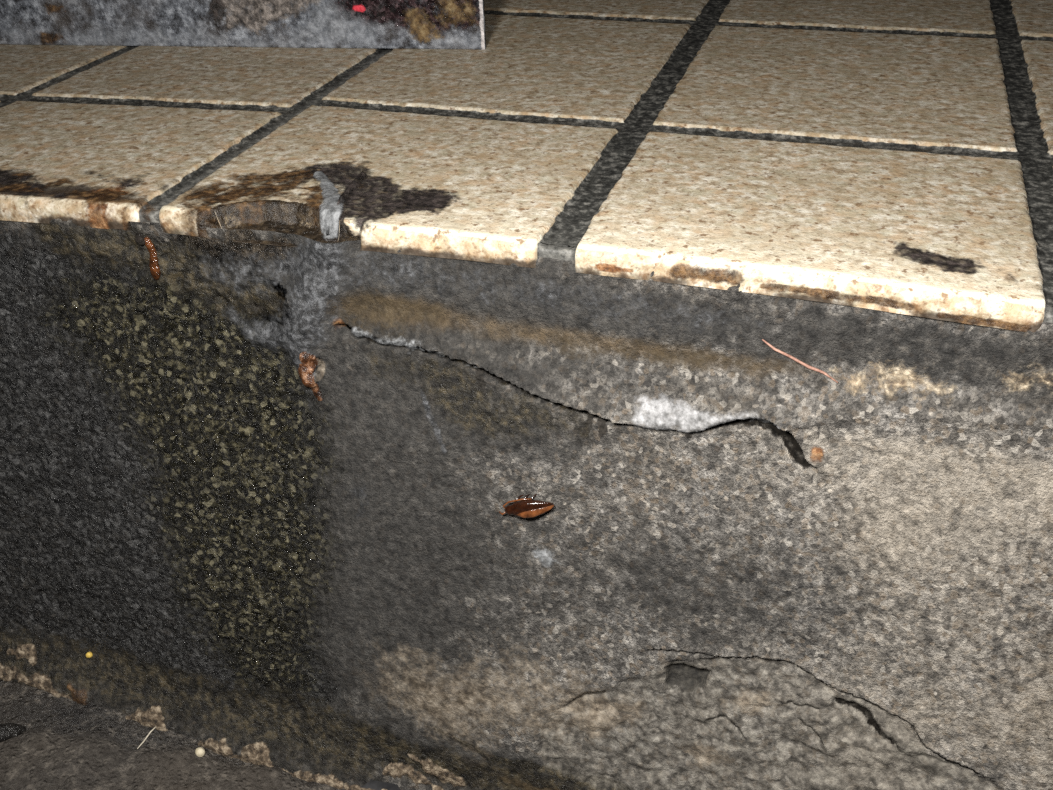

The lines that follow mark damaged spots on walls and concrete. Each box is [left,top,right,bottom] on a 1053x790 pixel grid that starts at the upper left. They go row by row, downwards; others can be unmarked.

water stain [0,222,634,790]
crack [351,328,812,469]